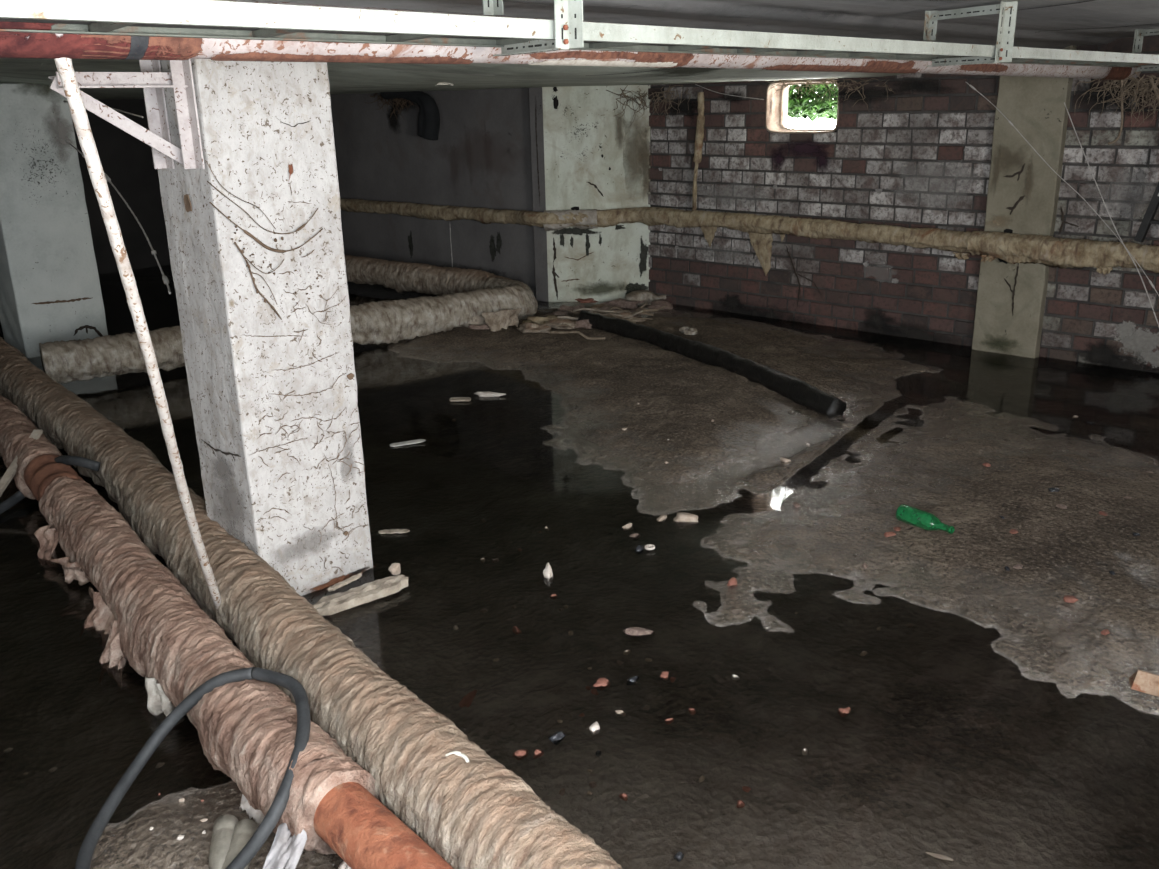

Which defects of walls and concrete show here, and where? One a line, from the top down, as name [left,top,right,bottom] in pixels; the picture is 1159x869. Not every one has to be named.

rust [0,21,474,64]
rust [529,51,694,68]
rust [762,60,921,74]
rust [960,64,1009,72]
rust [1102,67,1132,80]
damp [538,87,598,138]
damp [617,117,650,188]
crack [1004,164,1025,215]
damp [553,227,602,255]
damp [578,236,648,294]
crack [1004,263,1019,316]
crack [201,249,368,572]